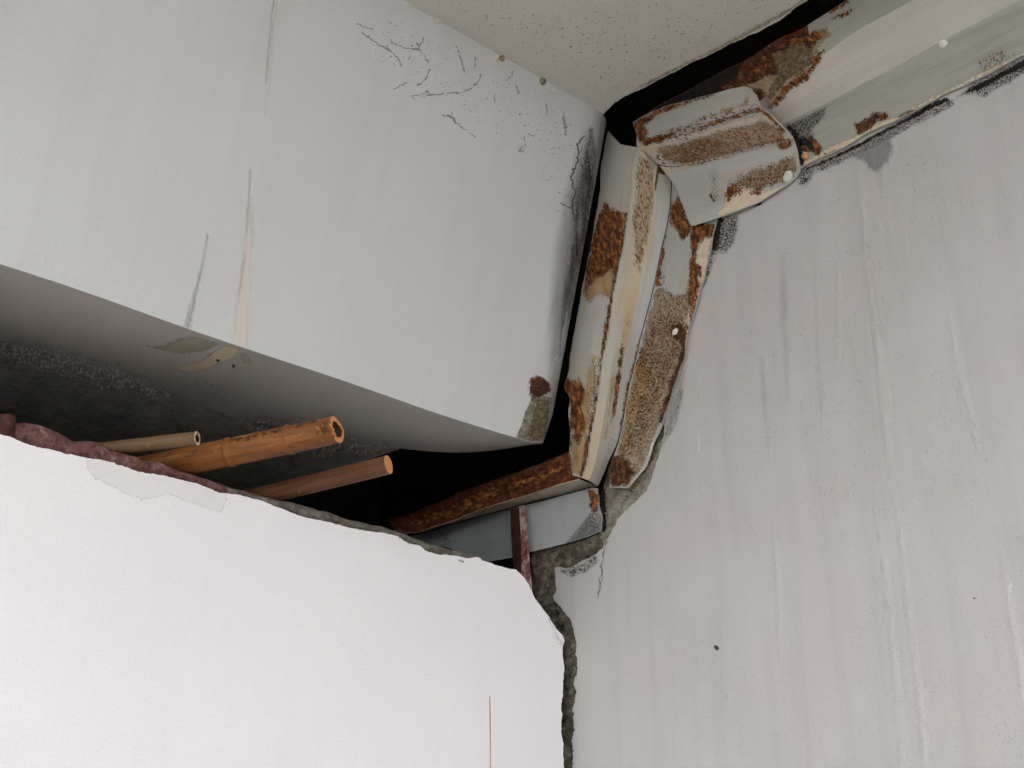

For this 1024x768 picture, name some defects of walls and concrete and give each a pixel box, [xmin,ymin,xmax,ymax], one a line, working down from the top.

mould [965,59,1024,96]
crack [561,121,585,219]
damp [799,98,954,185]
rust [409,0,852,527]
spalling [0,342,174,402]
spalling [0,412,16,439]
spalling [515,375,552,441]
peeling [87,458,231,512]